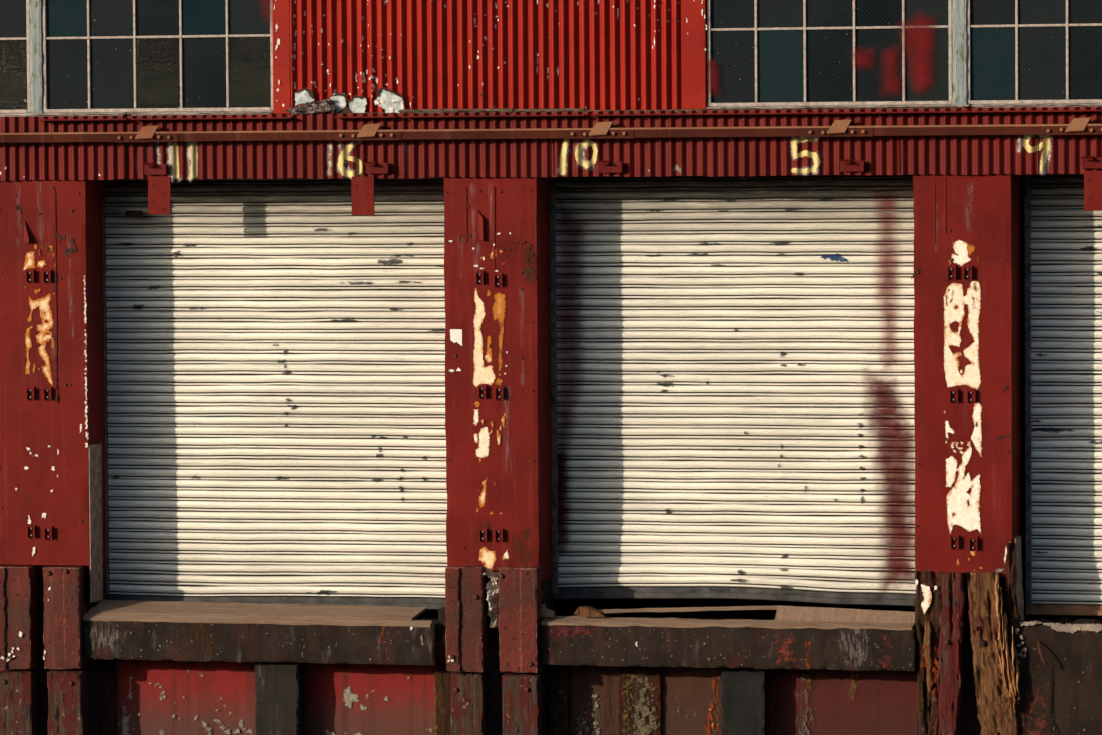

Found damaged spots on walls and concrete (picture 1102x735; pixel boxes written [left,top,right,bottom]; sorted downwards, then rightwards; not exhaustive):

peeling [23,243,56,270]
peeling [949,240,979,266]
peeling [25,286,55,386]
peeling [473,289,508,387]
peeling [943,281,981,389]
peeling [473,401,506,462]
peeling [476,476,502,515]
peeling [944,402,982,534]
peeling [479,547,509,573]
corrosion [775,634,812,668]
peeling [343,687,389,710]
corrosion [704,667,721,735]